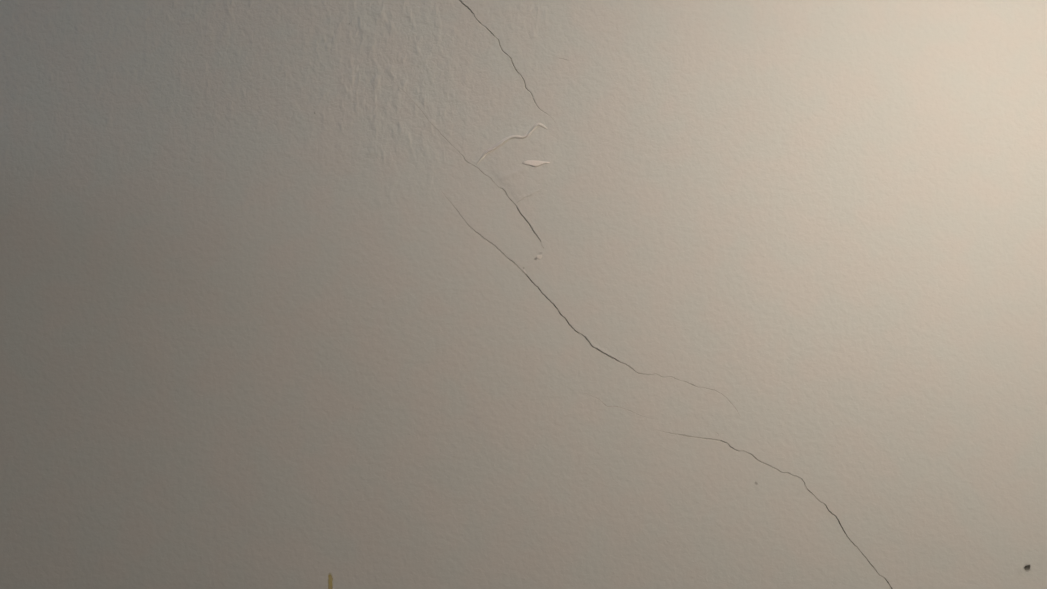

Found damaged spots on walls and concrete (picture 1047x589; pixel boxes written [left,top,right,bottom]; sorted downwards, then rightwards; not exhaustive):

crack [459,0,556,123]
crack [392,80,544,249]
crack [441,191,740,416]
crack [657,430,893,589]